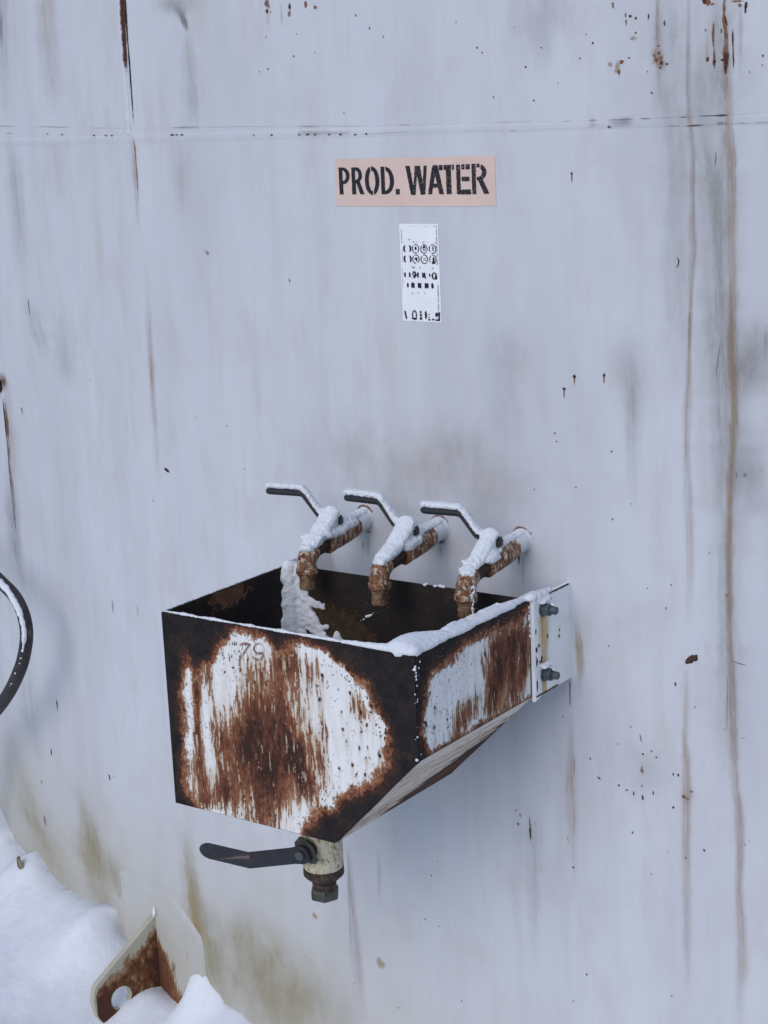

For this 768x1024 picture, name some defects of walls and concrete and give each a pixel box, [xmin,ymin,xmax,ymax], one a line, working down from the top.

corrosion [120,0,133,112]
corrosion [702,0,747,73]